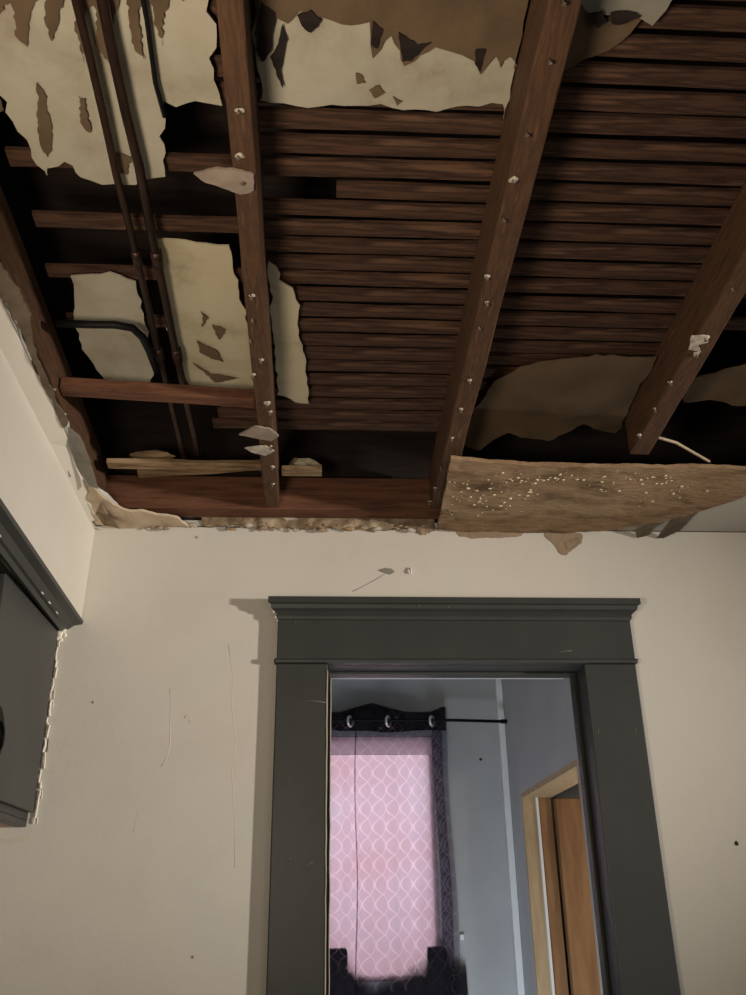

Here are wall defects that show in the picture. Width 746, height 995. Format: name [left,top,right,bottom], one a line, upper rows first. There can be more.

flaking render [0,263,435,535]
peeling [456,531,523,539]
peeling [544,532,583,555]